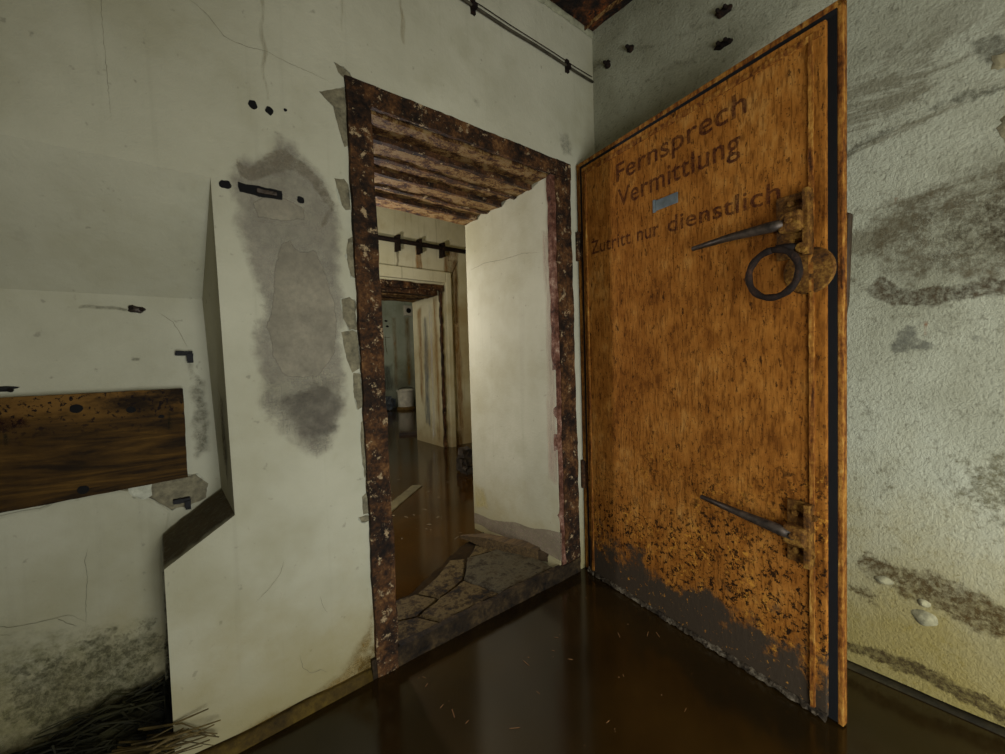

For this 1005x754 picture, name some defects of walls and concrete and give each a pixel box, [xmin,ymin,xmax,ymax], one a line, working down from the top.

flaking render [976,35,1005,70]
flaking render [996,115,1005,140]
flaking render [121,473,234,565]
damp [858,557,1005,637]
damp [847,642,1005,726]